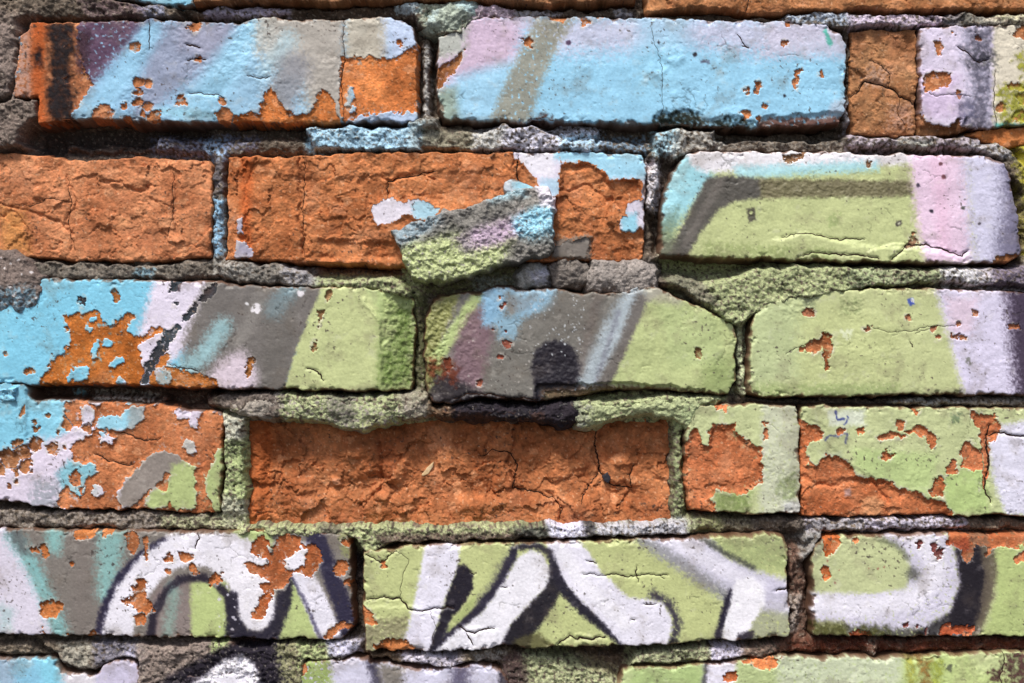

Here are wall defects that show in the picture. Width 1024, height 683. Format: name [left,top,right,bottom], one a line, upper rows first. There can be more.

peeling [13,22,94,130]
peeling [214,40,421,131]
crack [850,60,968,125]
crack [957,46,997,123]
spalling [0,151,539,271]
spalling [526,152,644,264]
crack [782,233,968,259]
peeling [24,281,224,390]
peeling [0,399,226,514]
crack [483,431,634,517]
peeling [682,403,769,512]
spalling [796,407,1001,517]